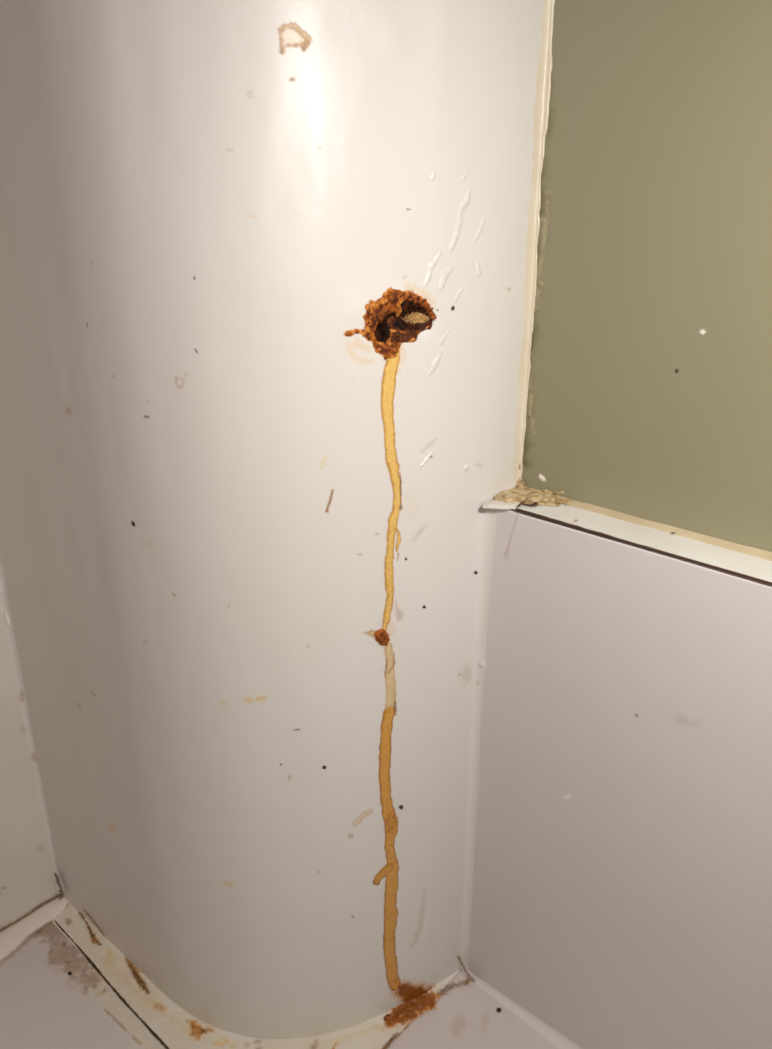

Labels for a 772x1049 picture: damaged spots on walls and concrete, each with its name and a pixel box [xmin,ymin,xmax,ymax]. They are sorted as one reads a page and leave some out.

hole [374,298,435,344]